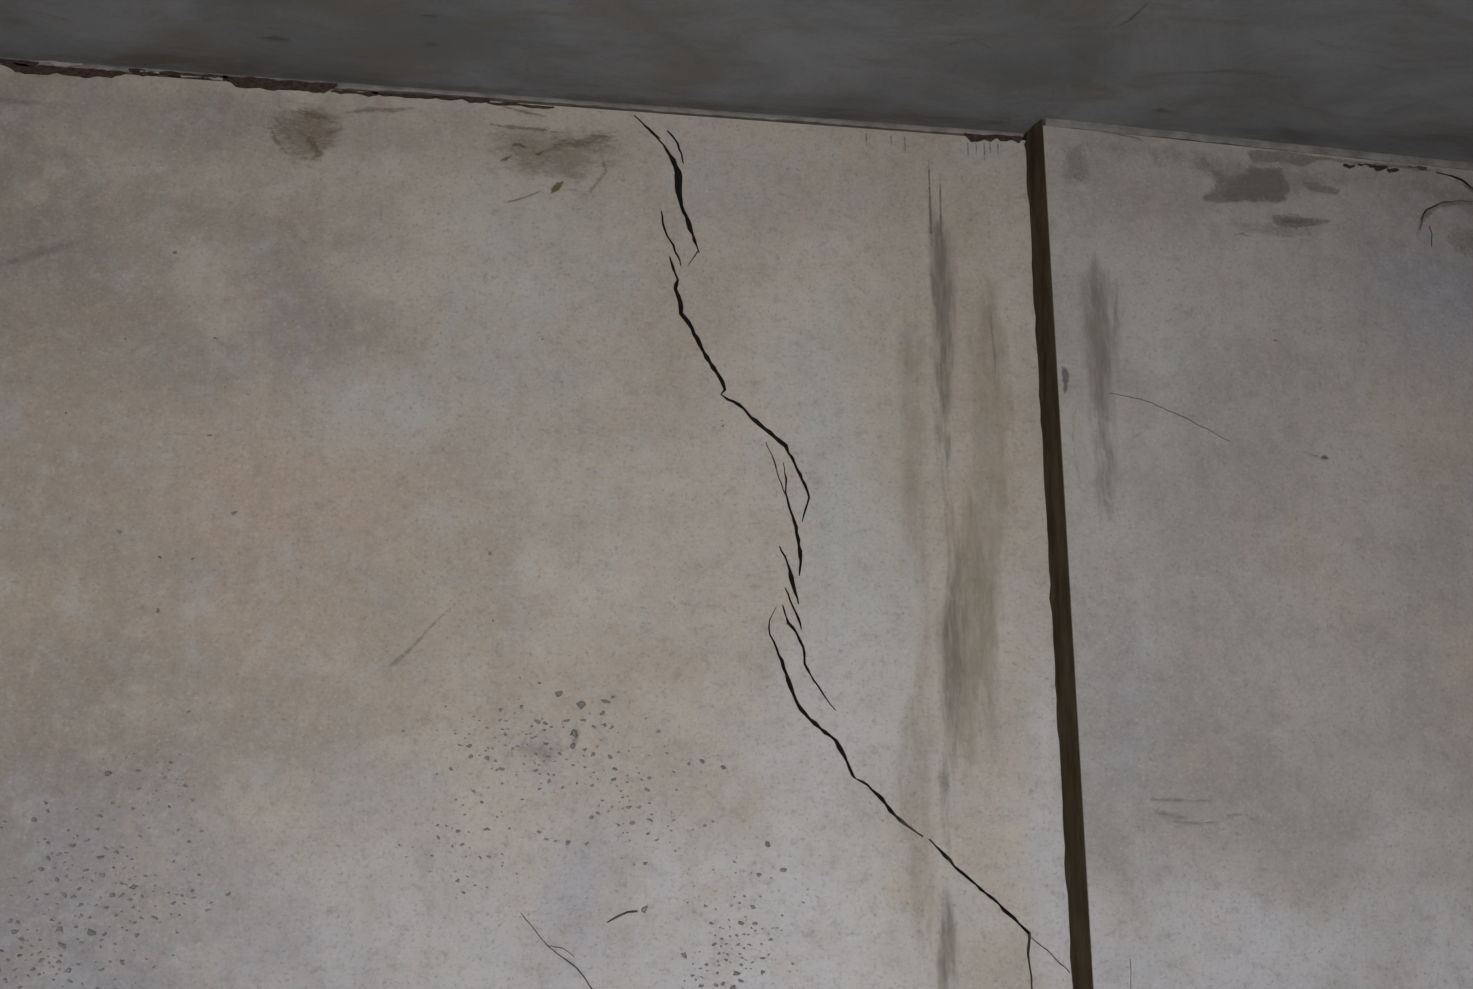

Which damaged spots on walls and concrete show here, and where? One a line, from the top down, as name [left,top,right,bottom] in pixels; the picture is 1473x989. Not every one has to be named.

crack [1420,172,1473,247]
crack [635,116,1070,989]
crack [521,913,593,989]